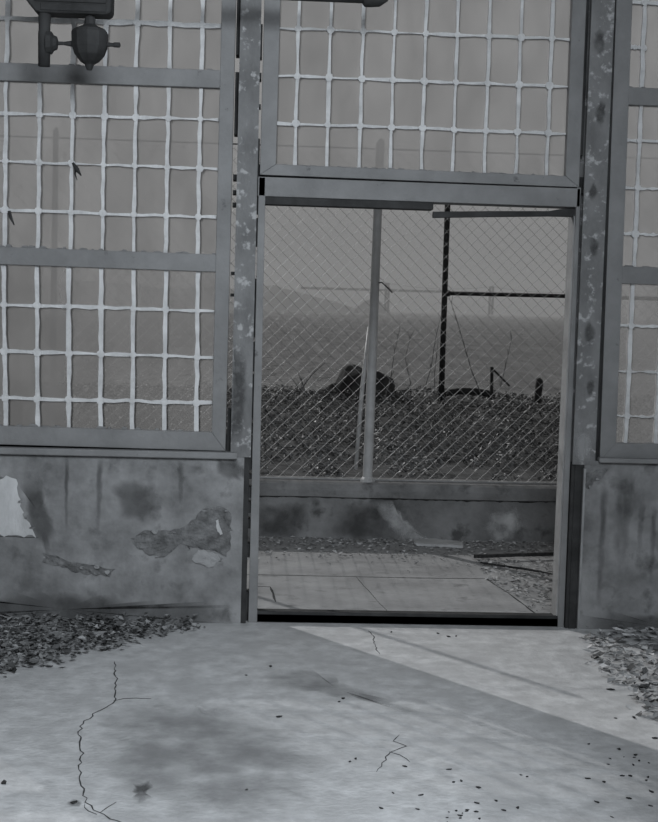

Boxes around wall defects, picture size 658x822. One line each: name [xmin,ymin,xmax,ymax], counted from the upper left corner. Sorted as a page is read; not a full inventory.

peeling [0,475,38,538]
crack [77,661,150,822]